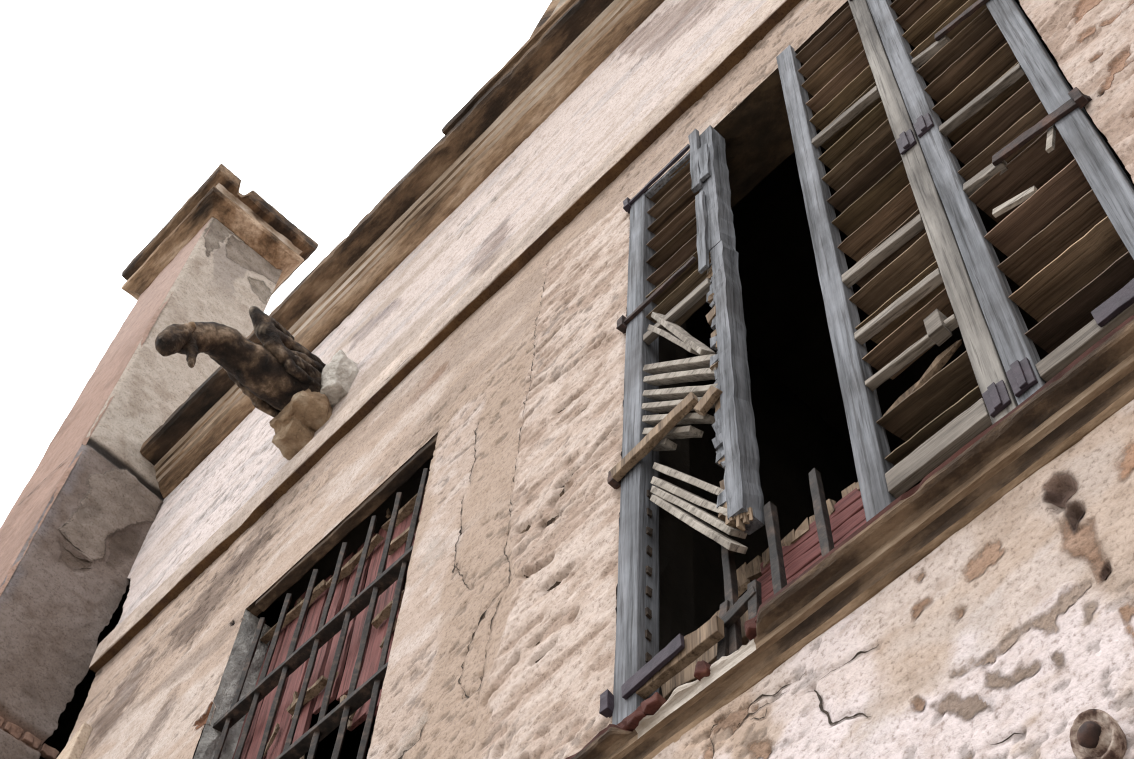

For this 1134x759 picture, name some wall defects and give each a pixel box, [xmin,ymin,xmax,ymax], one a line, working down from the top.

peeling [1071,0,1134,44]
peeling [1088,45,1134,97]
crack [452,264,548,699]
spalling [910,472,1112,720]
crack [710,644,879,758]
peeling [702,705,759,759]
spalling [748,739,772,759]